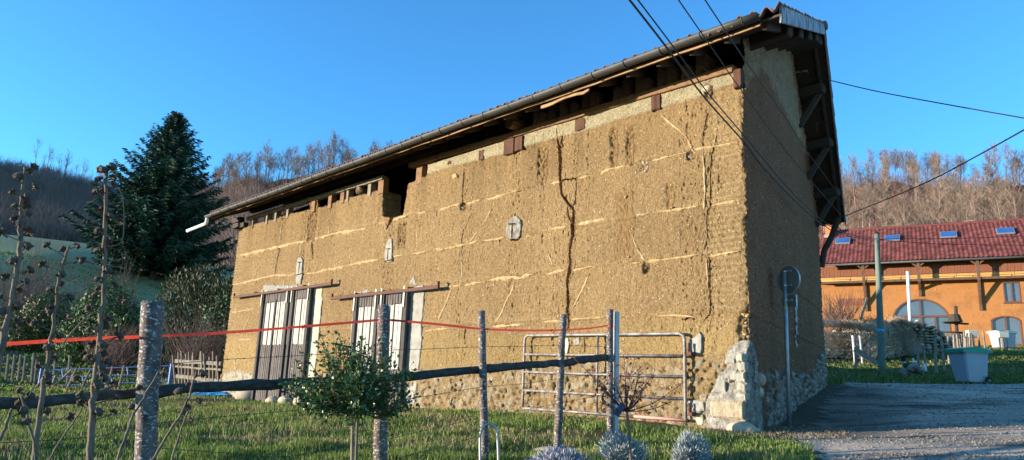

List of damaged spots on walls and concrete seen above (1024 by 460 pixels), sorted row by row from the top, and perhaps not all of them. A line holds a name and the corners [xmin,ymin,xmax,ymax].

crack [556,128,586,351]
crack [683,110,717,331]